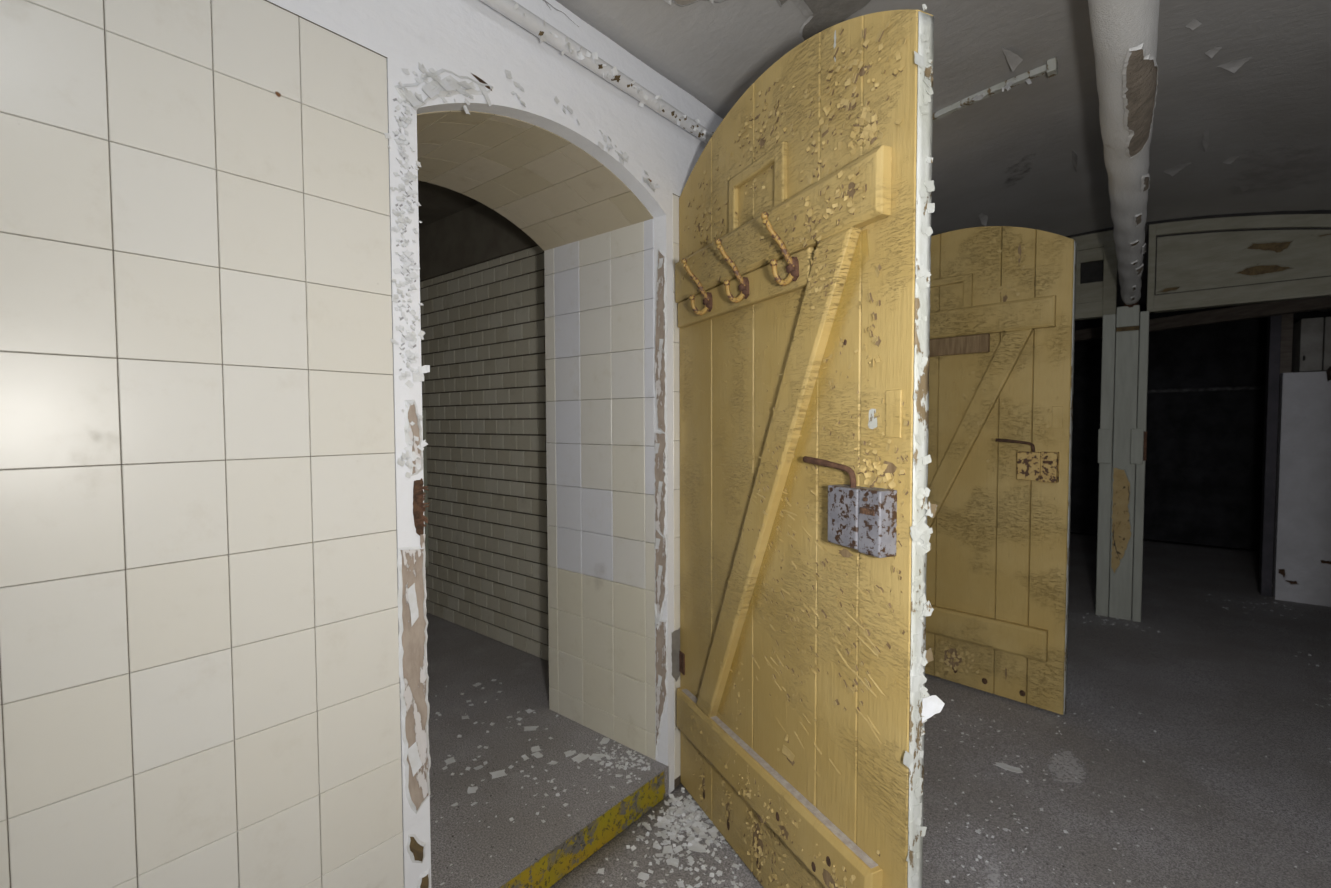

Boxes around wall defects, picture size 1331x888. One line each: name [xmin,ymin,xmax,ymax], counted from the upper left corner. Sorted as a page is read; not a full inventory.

peeling [540,20,714,142]
peeling [958,47,1032,108]
peeling [1122,43,1158,158]
peeling [1205,47,1252,73]
flaking render [384,62,493,814]
peeling [654,0,936,760]
peeling [685,336,962,836]
flaking render [406,834,431,888]
peeling [690,715,856,888]
peeling [906,852,920,883]